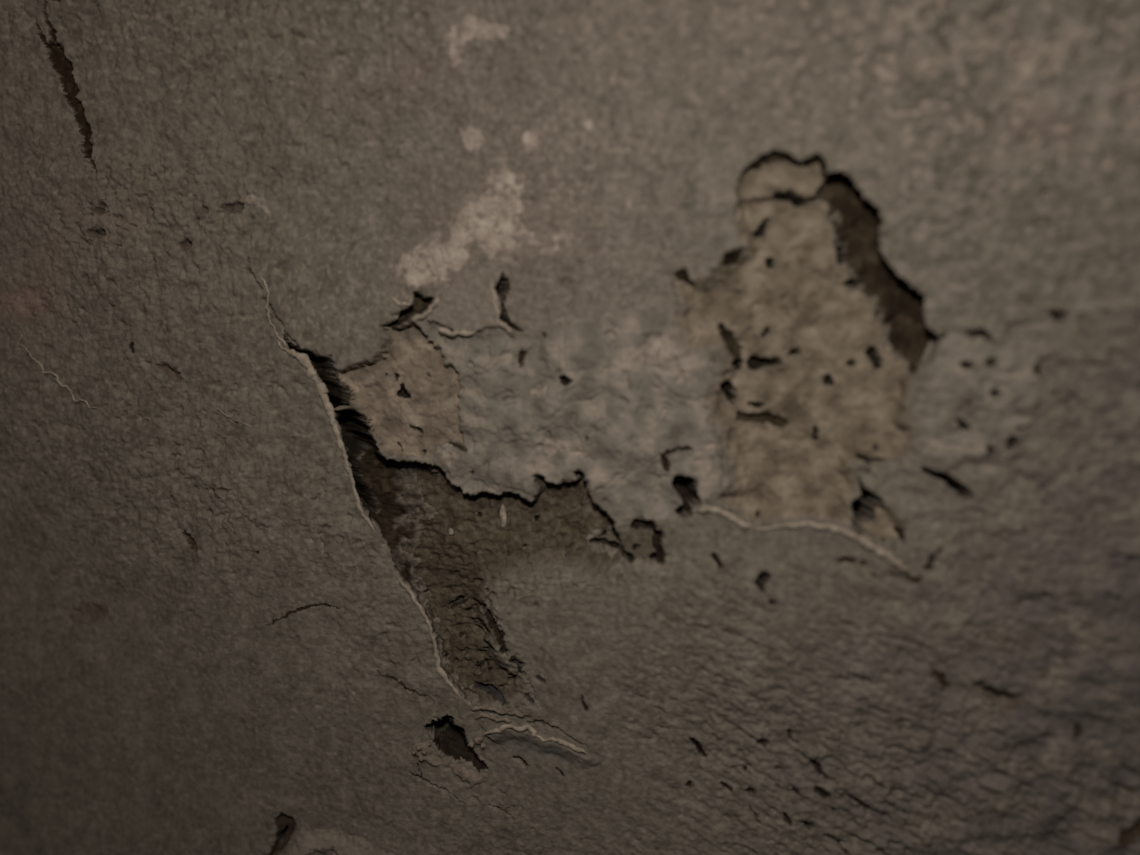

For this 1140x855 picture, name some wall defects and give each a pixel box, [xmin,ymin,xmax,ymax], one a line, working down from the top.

crack [36,0,97,174]
peeling [248,179,525,458]
spalling [518,347,528,368]
spalling [559,373,573,386]
spalling [671,150,1049,543]
spalling [661,446,693,473]
spalling [587,509,674,570]
spalling [711,552,725,570]
spalling [755,571,778,606]
spalling [858,547,943,585]
spalling [446,586,546,684]
peeling [467,724,606,776]